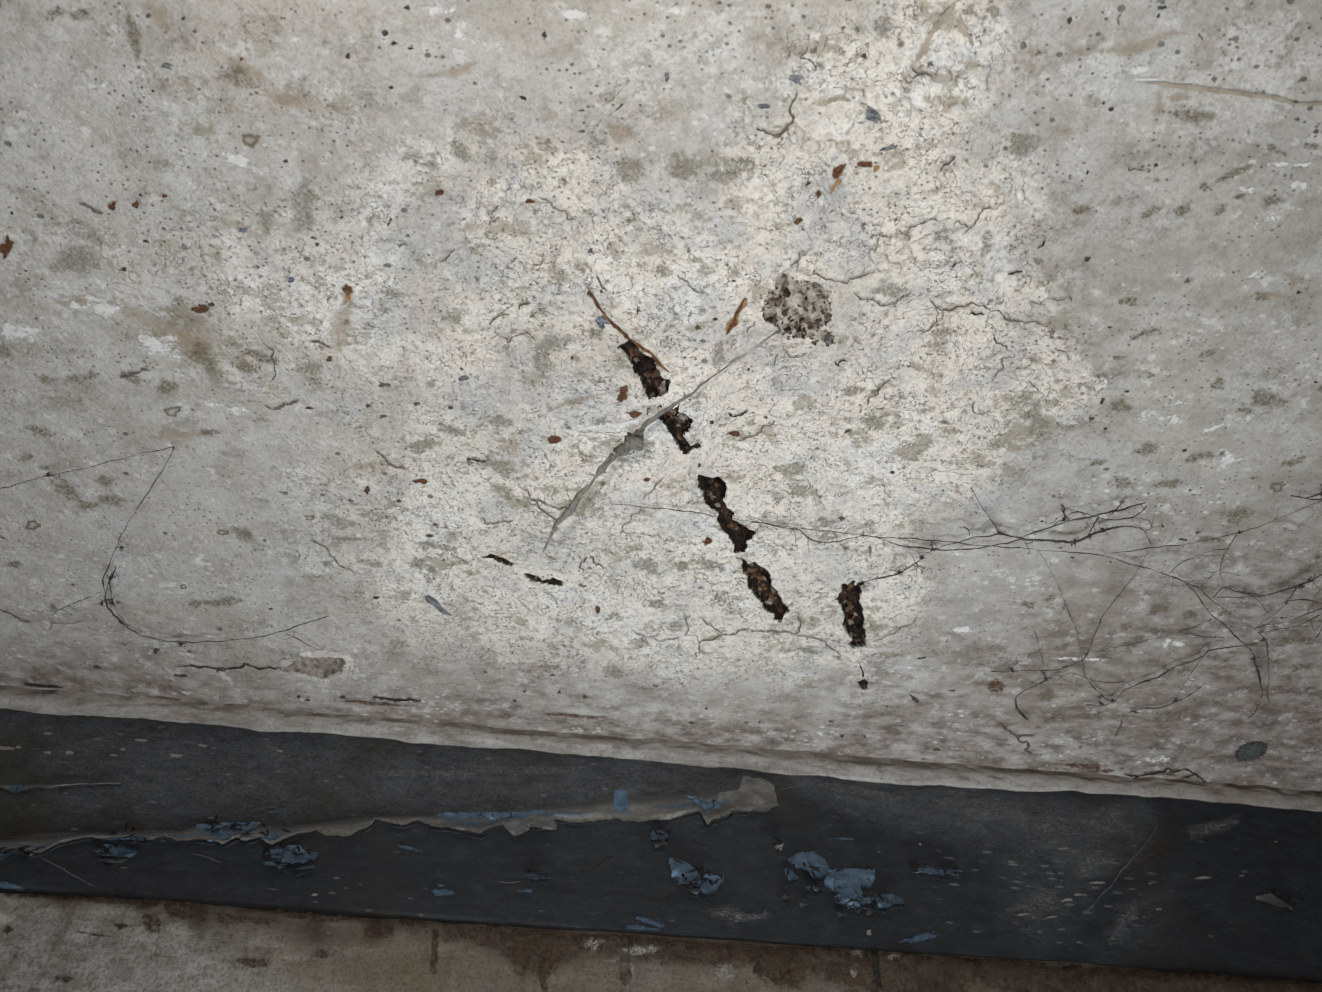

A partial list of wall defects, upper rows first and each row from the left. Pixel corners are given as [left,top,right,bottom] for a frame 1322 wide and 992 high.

spalling [745,259,849,357]
rust [617,386,641,418]
crack [727,410,775,443]
crack [620,476,666,539]
spalling [595,315,799,628]
crack [0,609,83,630]
crack [311,540,354,573]
flaking render [825,545,930,653]
peeling [0,776,779,899]
peeling [771,837,905,924]